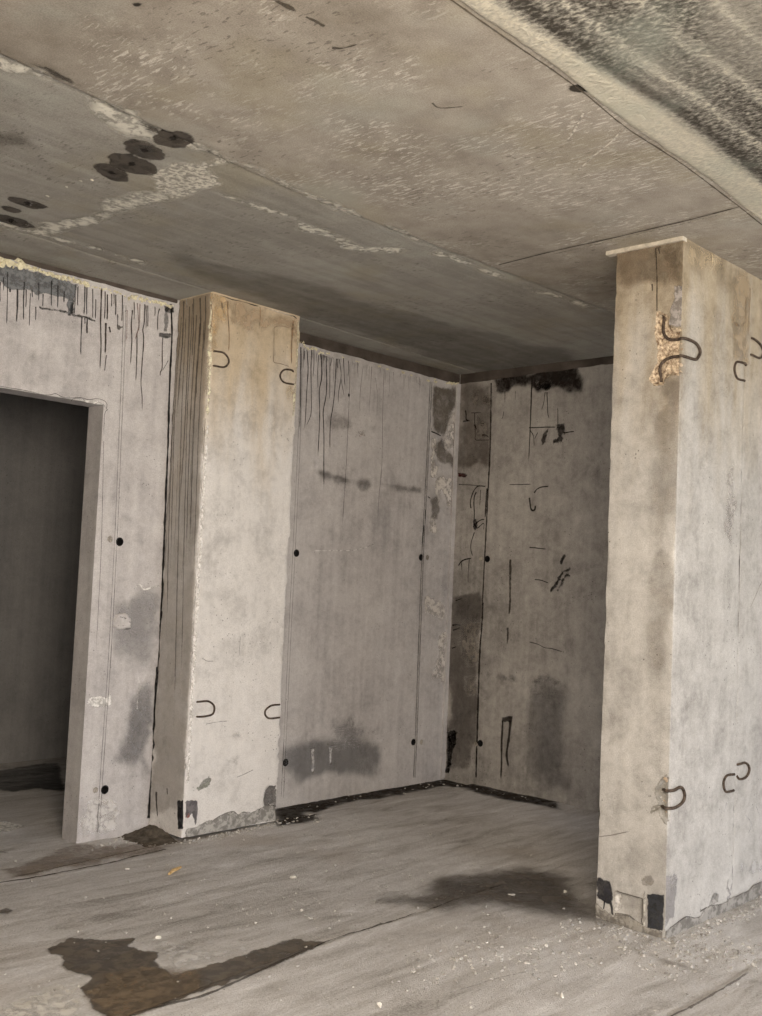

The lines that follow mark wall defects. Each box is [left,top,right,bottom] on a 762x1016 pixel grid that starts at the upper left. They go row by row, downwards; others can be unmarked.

leakage [0,59,72,83]
leakage [0,95,232,243]
leakage [298,223,404,253]
leakage [0,265,206,407]
spalling [649,286,683,386]
leakage [299,341,459,475]
peeling [428,413,455,506]
spalling [177,785,276,837]
leakage [276,730,557,825]
leakage [500,716,512,776]
spalling [595,878,762,939]
leakage [48,938,327,1016]